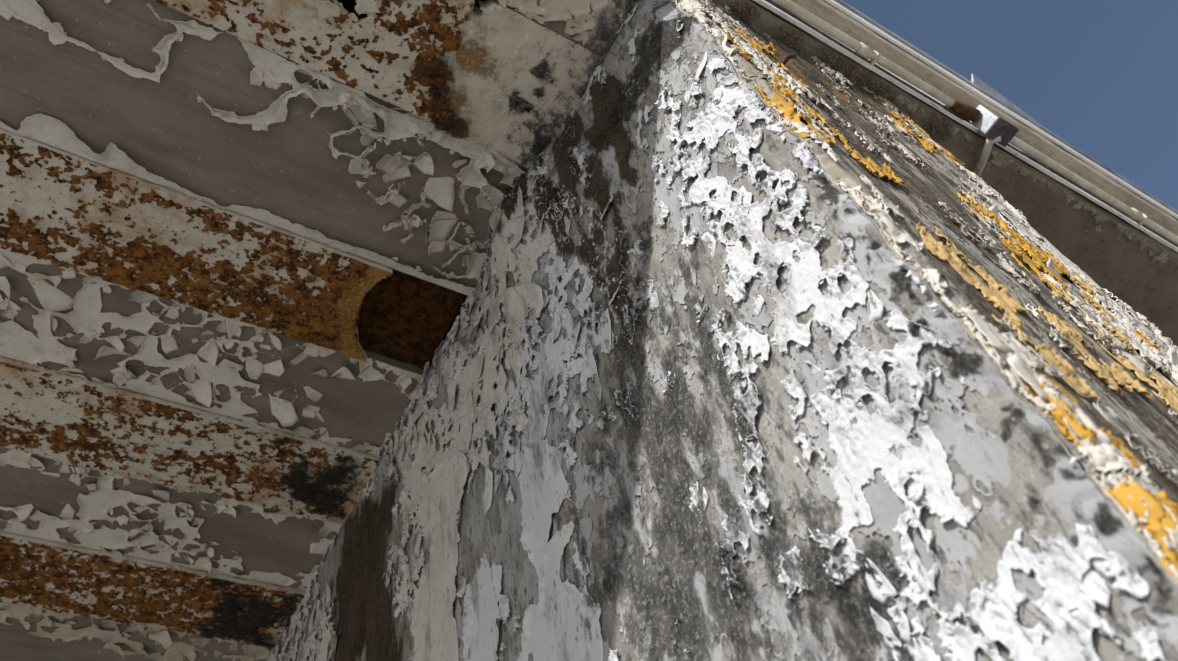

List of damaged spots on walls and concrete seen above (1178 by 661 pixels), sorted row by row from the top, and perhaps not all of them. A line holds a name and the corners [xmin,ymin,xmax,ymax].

corrosion [155,0,506,145]
corrosion [0,362,379,521]
corrosion [0,134,466,369]
peeling [0,0,659,661]
leakage [500,0,1178,661]
peeling [636,0,1178,661]
corrosion [0,535,304,649]
leakage [327,476,402,661]